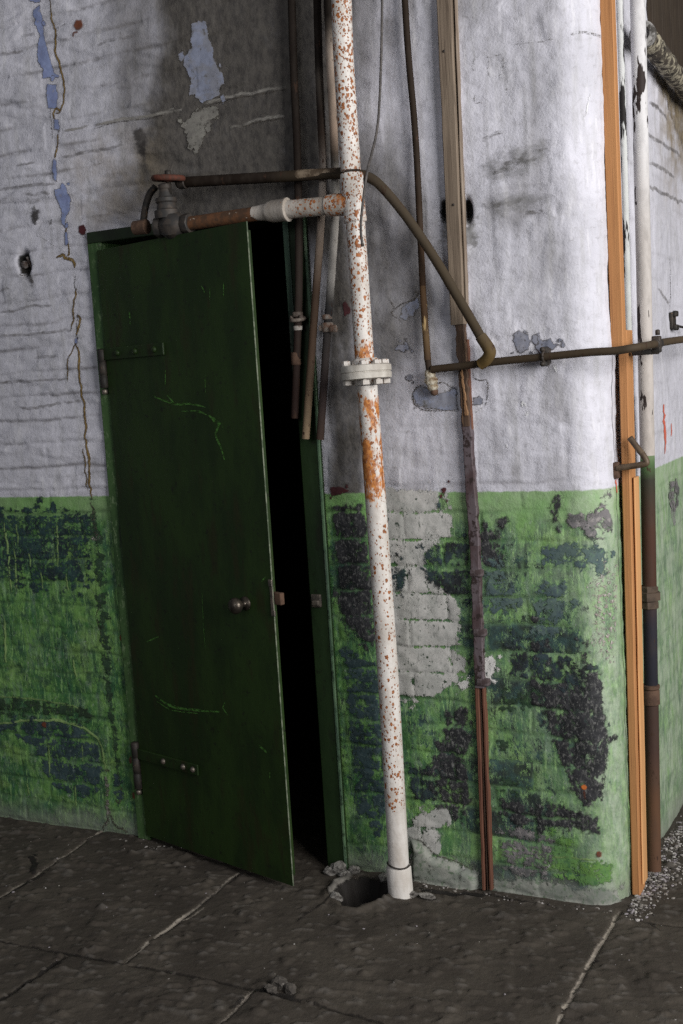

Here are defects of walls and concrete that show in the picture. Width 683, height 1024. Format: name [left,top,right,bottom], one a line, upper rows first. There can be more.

peeling [29,0,60,130]
peeling [177,21,225,155]
peeling [52,159,71,245]
peeling [406,374,459,411]
peeling [0,496,95,598]
crack [0,228,128,898]
peeling [385,480,625,905]
spalling [328,873,352,893]
crack [556,913,666,1024]